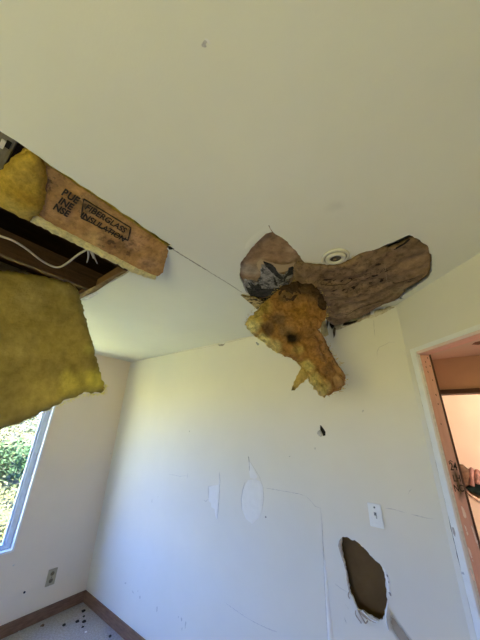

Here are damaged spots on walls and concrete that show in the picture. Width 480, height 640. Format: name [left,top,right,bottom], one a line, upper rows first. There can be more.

peeling [240,225,303,310]
spalling [382,567,409,640]